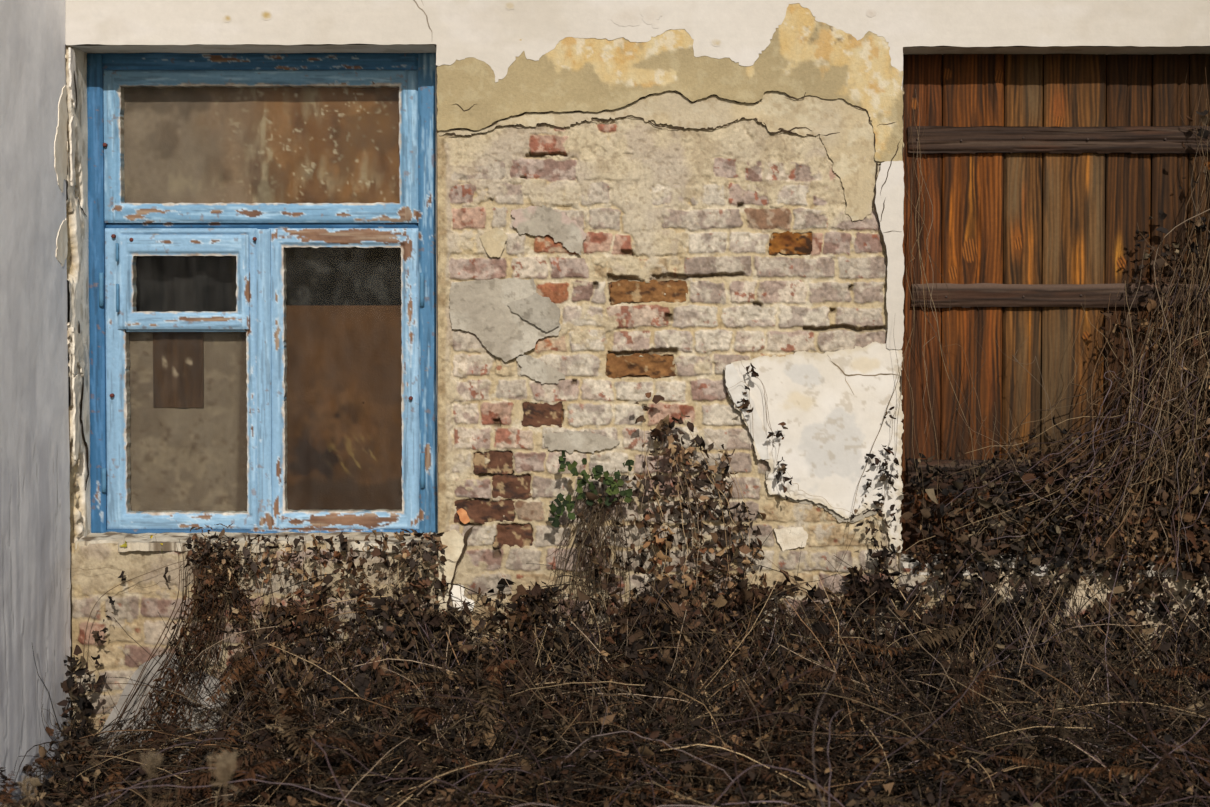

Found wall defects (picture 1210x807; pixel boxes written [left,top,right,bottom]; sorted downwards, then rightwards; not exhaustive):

spalling [54,3,953,738]
spalling [955,568,1210,699]